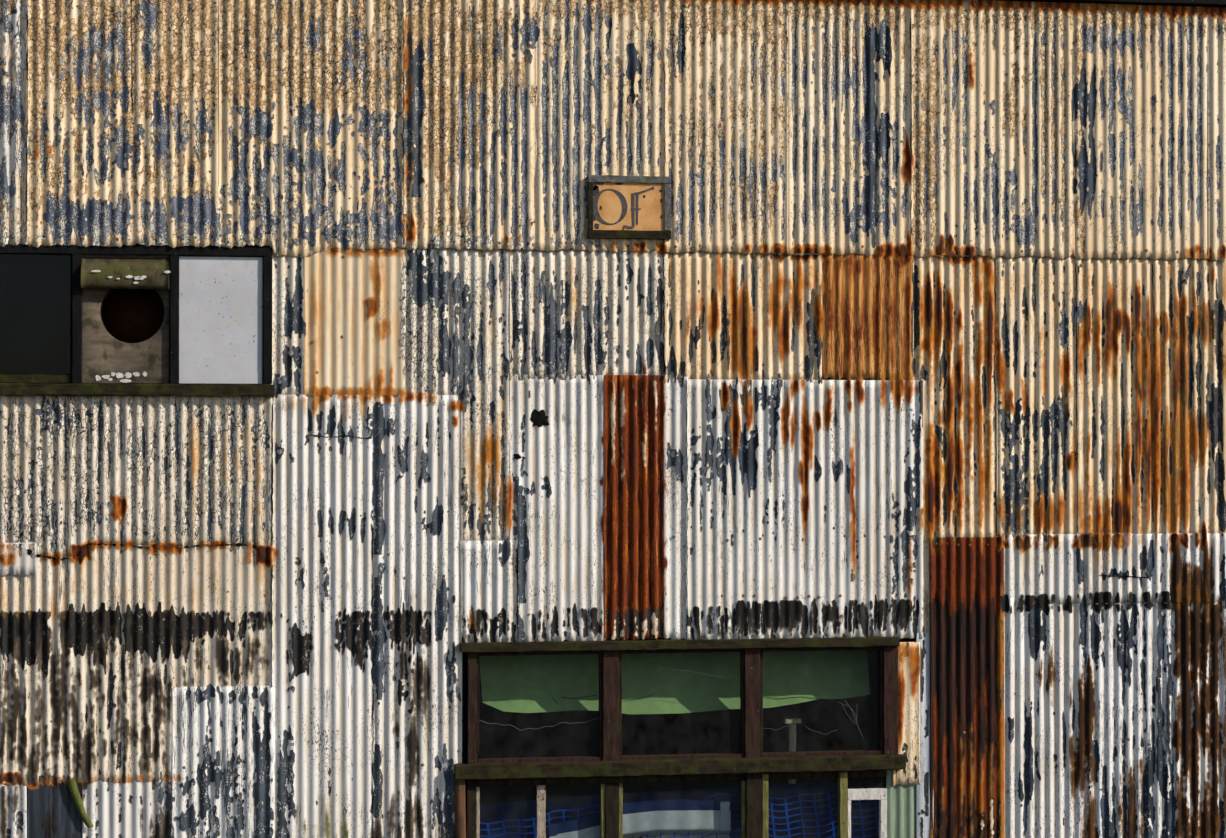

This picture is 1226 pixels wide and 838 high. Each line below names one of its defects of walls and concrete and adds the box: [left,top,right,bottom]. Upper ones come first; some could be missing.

corrosion [327,213,416,339]
peeling [0,0,926,709]
peeling [924,10,1226,542]
corrosion [42,540,133,566]
damp [0,602,314,838]
peeling [85,640,296,838]
damp [461,606,516,643]
damp [528,603,664,642]
corrosion [600,361,668,636]
damp [687,594,924,643]
corrosion [686,232,1226,838]
peeling [1076,540,1179,838]